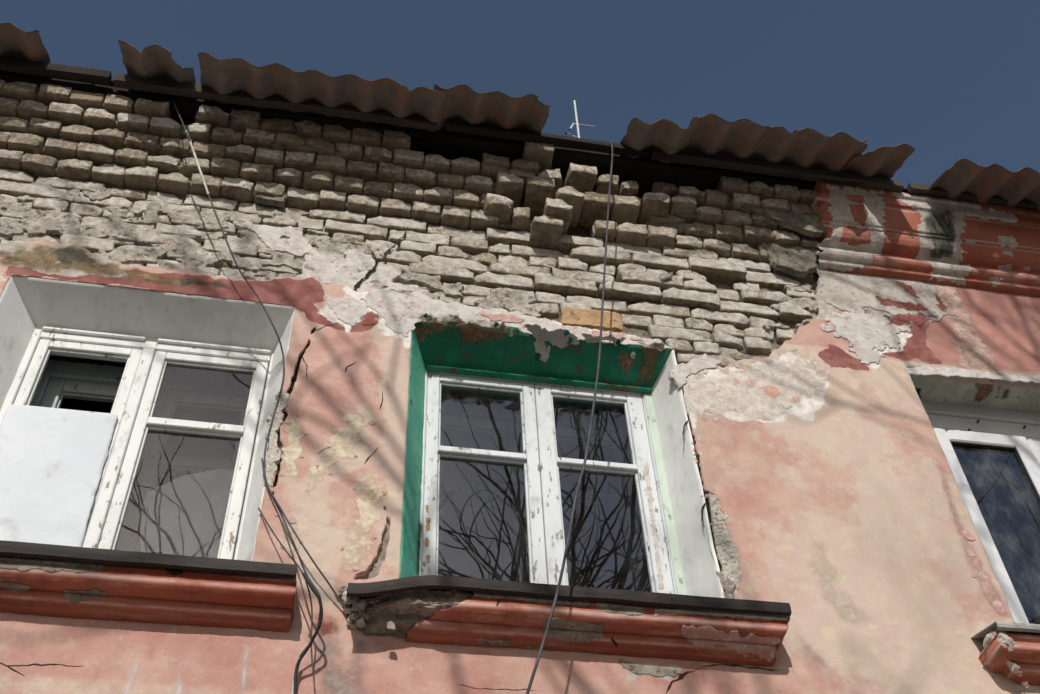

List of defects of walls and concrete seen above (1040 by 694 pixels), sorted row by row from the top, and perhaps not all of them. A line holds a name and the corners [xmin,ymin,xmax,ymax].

spalling [0,79,1018,441]
damp [926,210,955,259]
crack [263,325,332,488]
peeling [278,409,378,493]
crack [0,662,77,675]
peeling [0,556,106,592]
spalling [335,586,379,629]
peeling [340,472,387,571]
peeling [473,591,789,662]
crack [682,388,737,622]
crack [666,664,774,694]
spalling [708,490,742,599]